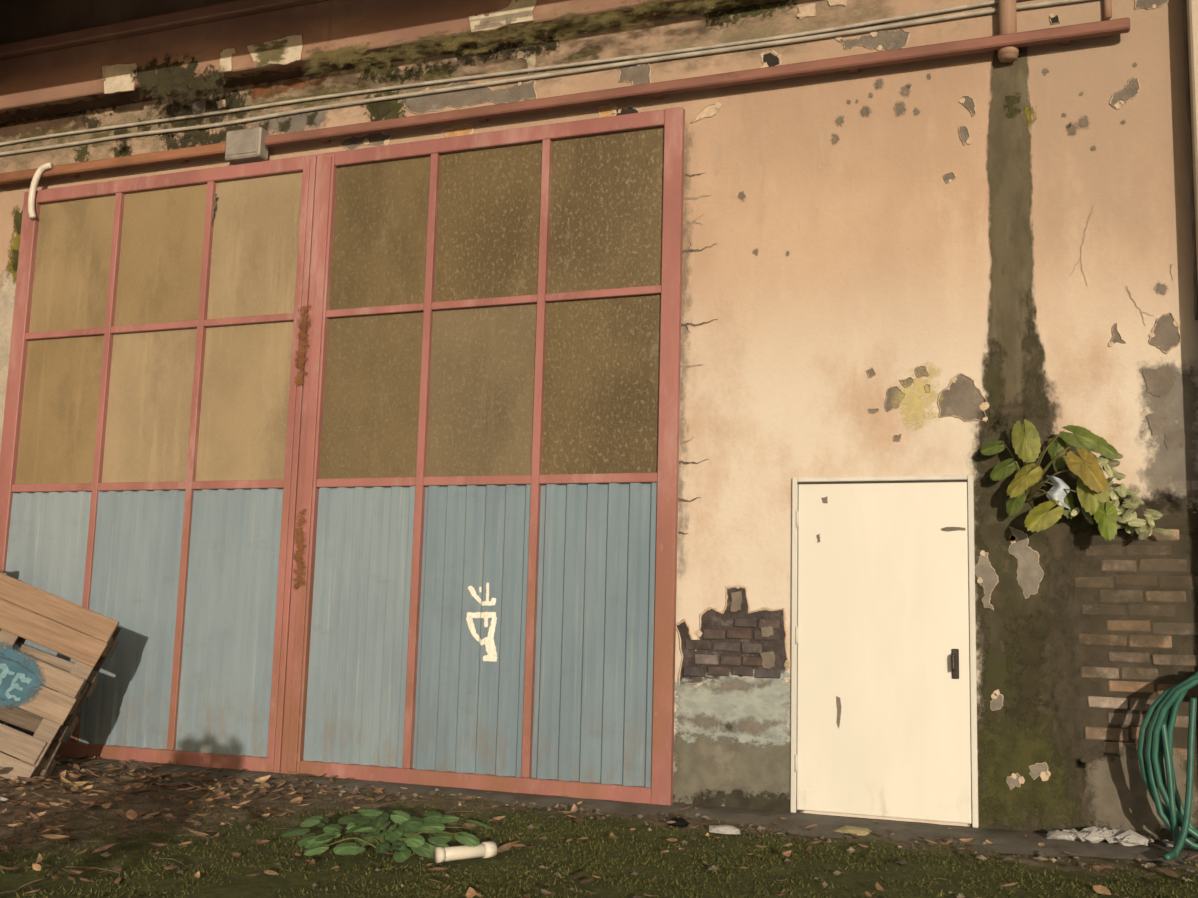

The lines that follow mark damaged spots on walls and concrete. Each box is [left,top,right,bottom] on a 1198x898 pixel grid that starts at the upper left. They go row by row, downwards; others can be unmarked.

leakage [0,42,509,138]
peeling [219,34,303,73]
peeling [468,0,538,33]
spalling [958,96,976,146]
peeling [0,270,16,452]
rust [295,305,311,385]
spalling [868,366,989,422]
spalling [1148,312,1181,354]
leakage [974,46,1198,843]
rust [293,510,306,589]
spalling [674,585,791,748]
flaking render [1008,508,1198,768]